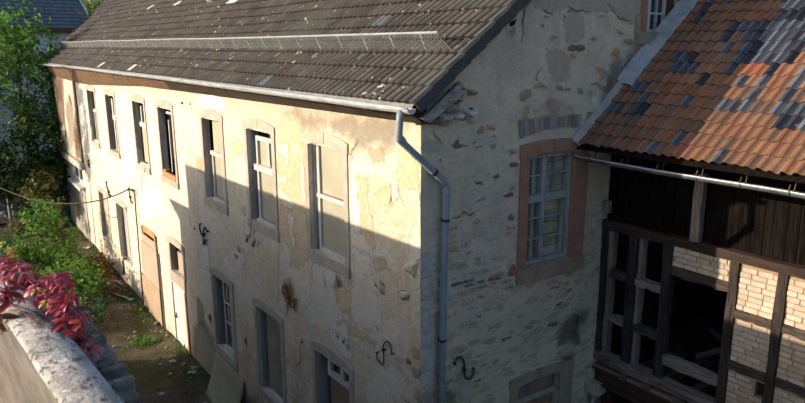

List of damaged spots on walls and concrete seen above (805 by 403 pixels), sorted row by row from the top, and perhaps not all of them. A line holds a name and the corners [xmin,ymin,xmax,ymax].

peeling [276,113,421,361]
corrosion [282,282,296,312]
damp [559,311,588,344]